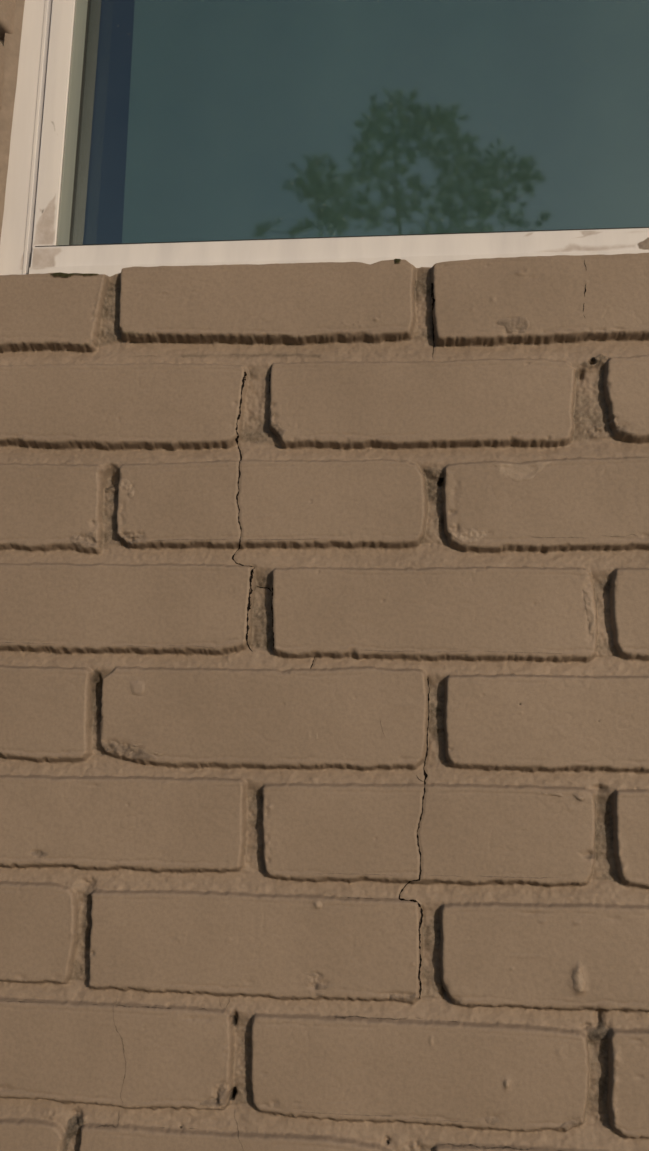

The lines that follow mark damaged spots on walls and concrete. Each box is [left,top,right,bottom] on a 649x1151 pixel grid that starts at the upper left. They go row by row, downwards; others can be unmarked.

crack [232,354,274,651]
crack [333,678,458,1023]